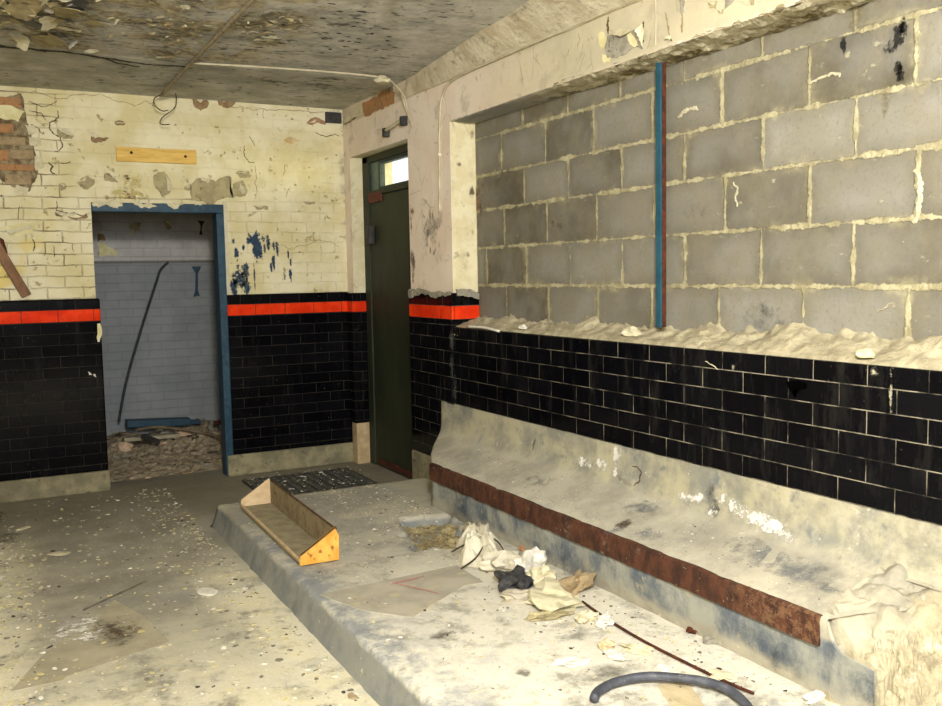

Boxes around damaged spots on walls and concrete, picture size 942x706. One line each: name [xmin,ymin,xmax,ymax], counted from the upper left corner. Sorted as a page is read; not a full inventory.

crack [0,45,185,67]
peeling [0,0,218,59]
spalling [451,0,876,134]
water stain [884,18,908,82]
flaking render [343,86,395,125]
flaking render [0,93,44,195]
peeling [55,171,251,220]